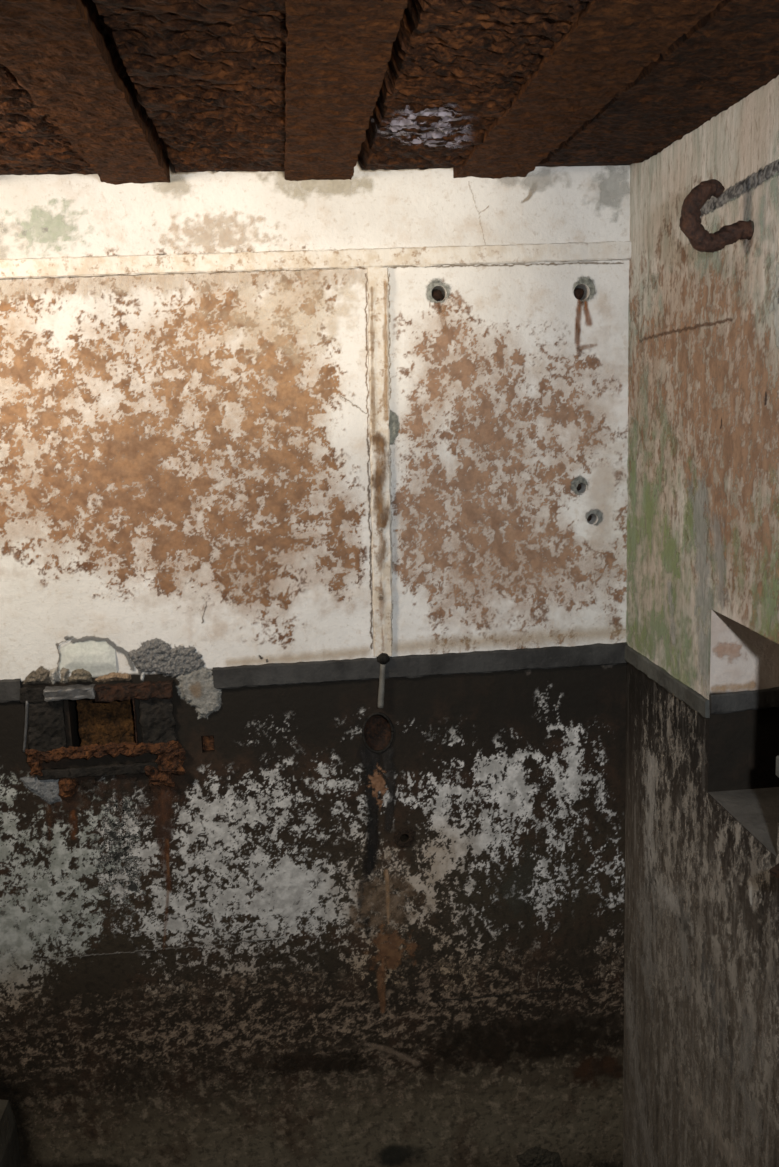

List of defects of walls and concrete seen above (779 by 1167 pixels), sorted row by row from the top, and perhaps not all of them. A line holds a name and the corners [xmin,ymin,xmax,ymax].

rust [575,300,593,355]
peeling [0,270,366,649]
peeling [389,220,779,654]
flaking render [23,638,222,719]
rust [48,763,187,892]
water stain [358,746,396,924]